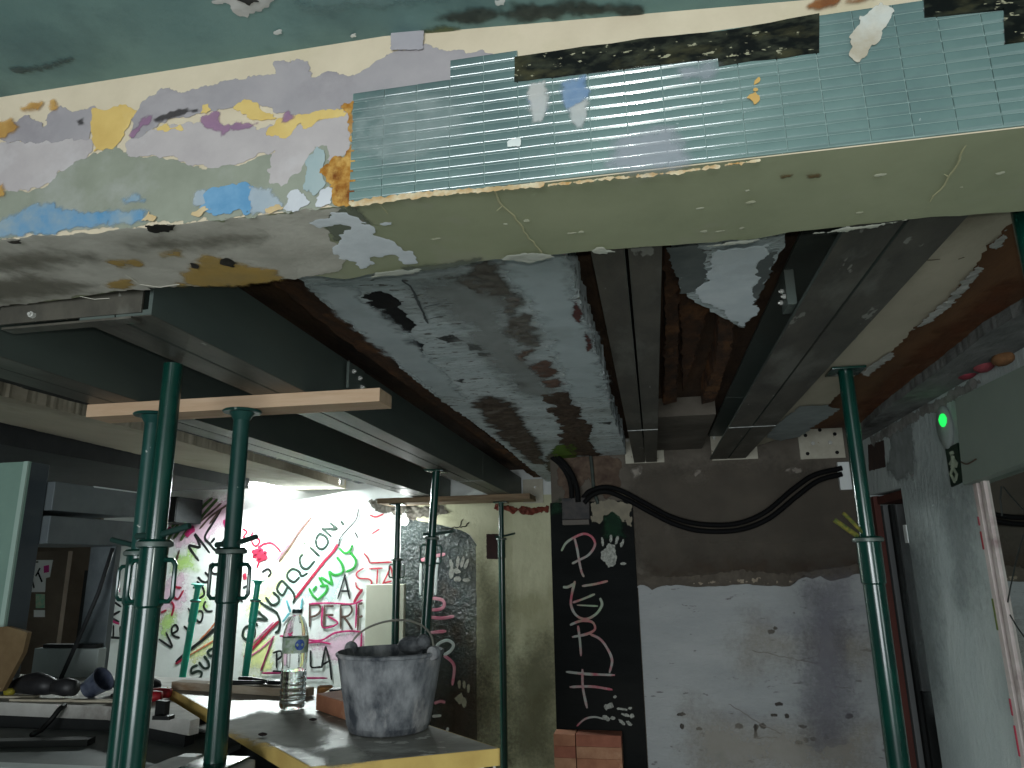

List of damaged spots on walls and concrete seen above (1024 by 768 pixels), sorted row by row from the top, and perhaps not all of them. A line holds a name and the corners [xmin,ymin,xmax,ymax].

spalling [0,30,860,590]
spalling [813,212,907,234]